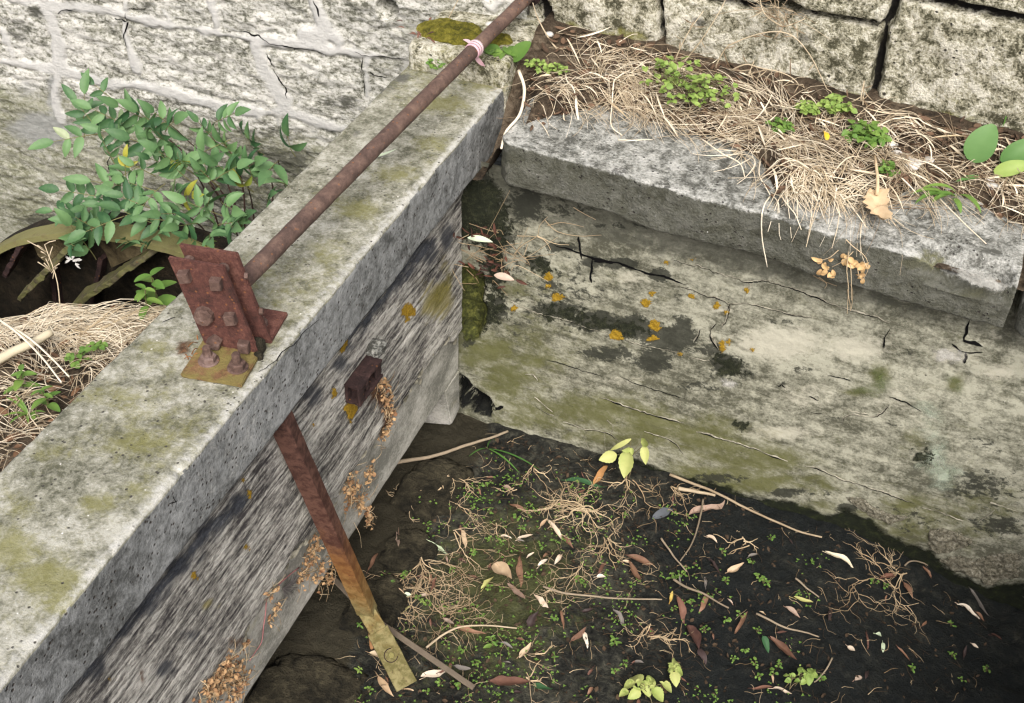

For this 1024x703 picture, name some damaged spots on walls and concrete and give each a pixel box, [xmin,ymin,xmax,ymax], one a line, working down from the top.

crack [226,30,323,98]
crack [511,236,890,361]
corrosion [177,335,202,359]
leakage [540,299,652,346]
crack [952,320,983,364]